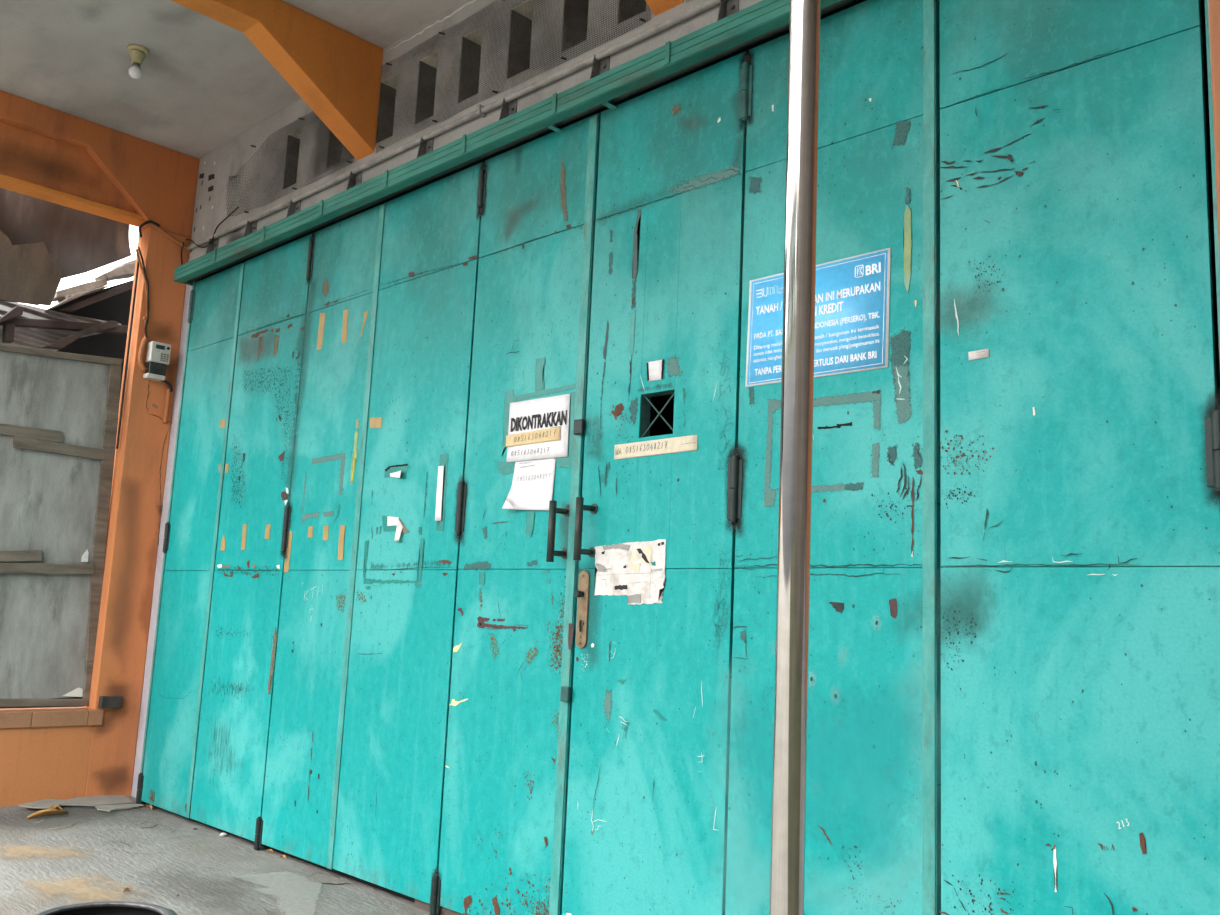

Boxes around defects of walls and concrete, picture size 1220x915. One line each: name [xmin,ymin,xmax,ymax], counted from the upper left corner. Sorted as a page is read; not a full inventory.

corrosion [477,604,529,644]
corrosion [548,586,574,673]
peeling [234,871,349,915]
corrosion [457,868,550,915]